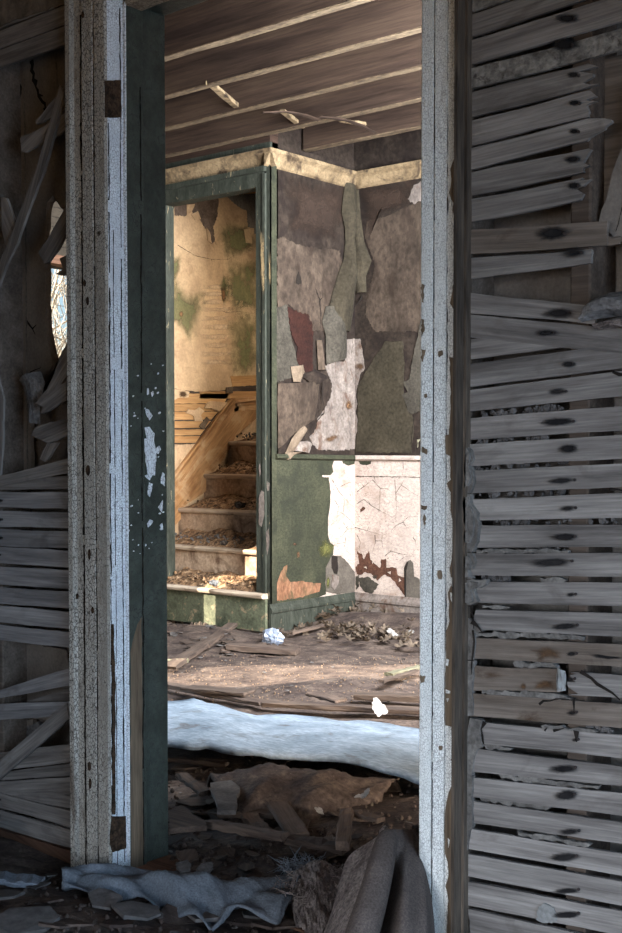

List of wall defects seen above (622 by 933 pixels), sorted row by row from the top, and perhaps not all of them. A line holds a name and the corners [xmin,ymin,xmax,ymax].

flaking render [174,193,271,445]
flaking render [287,307,314,372]
flaking render [309,338,371,466]
peeling [130,408,165,530]
peeling [259,464,270,554]
peeling [277,565,339,601]
peeling [355,551,405,595]